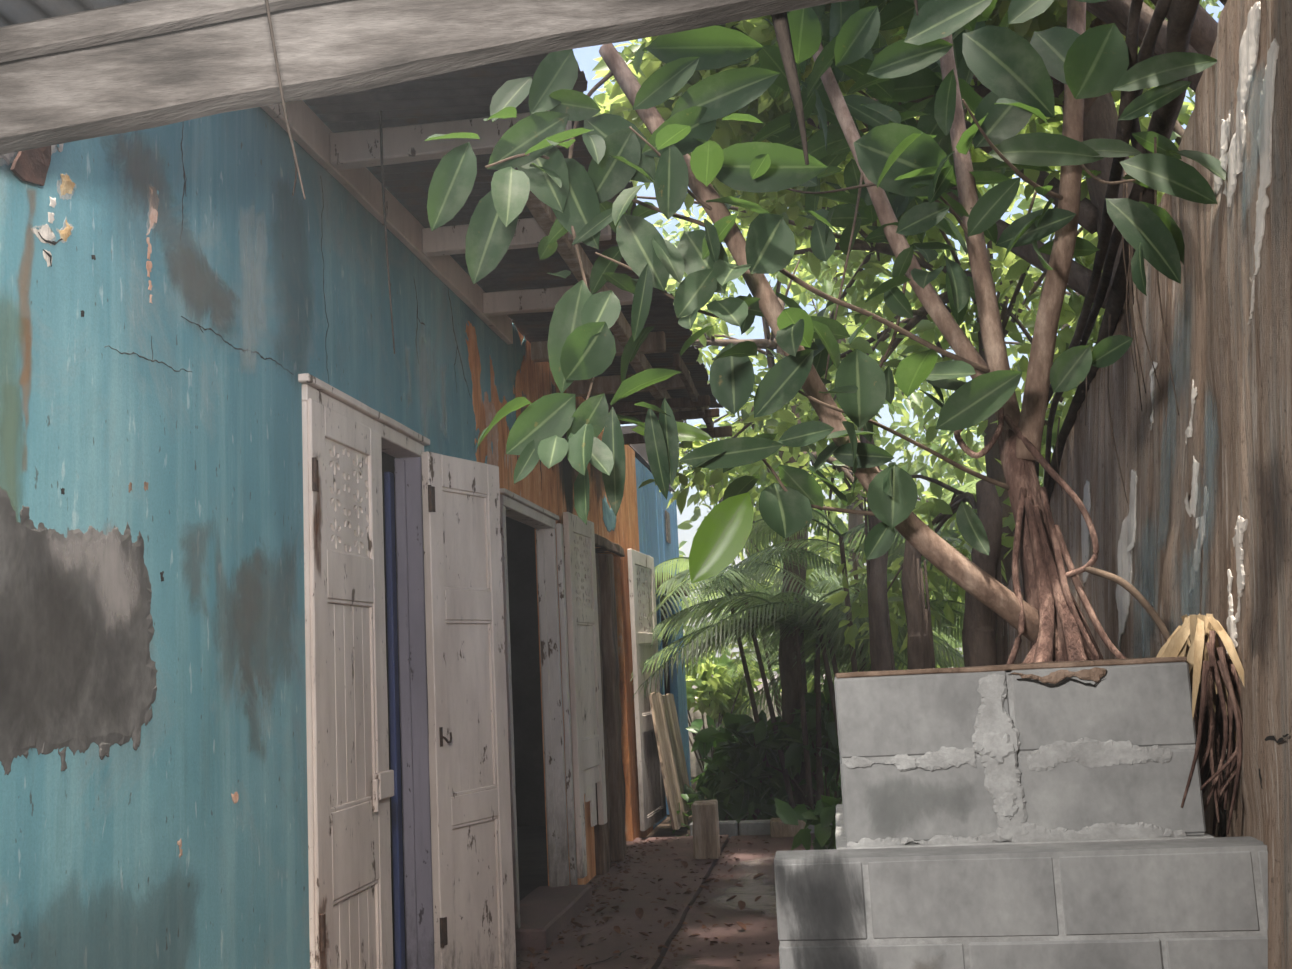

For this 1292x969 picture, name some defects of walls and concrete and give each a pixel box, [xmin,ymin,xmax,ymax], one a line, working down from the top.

peeling [30,173,76,267]
peeling [1214,1,1279,324]
crack [105,337,192,372]
crack [181,316,294,375]
peeling [1184,380,1209,594]
peeling [1116,469,1138,652]
peeling [1226,515,1248,659]